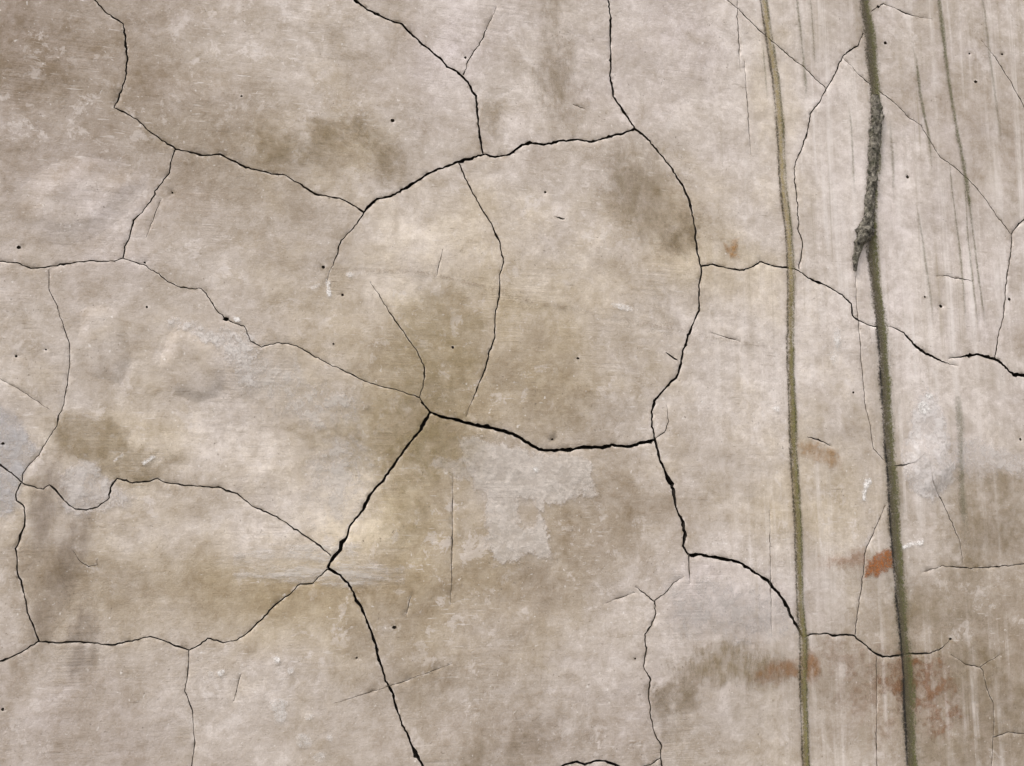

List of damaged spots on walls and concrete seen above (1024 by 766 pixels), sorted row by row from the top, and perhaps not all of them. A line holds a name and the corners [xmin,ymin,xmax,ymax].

crack [0,0,399,391]
crack [853,68,1024,377]
crack [233,0,876,766]
crack [859,333,884,460]
crack [0,355,331,718]
crack [857,506,885,615]
corrosion [865,550,893,577]
crack [924,493,1024,572]
crack [805,620,950,689]
crack [872,705,880,764]
crack [952,655,1024,766]